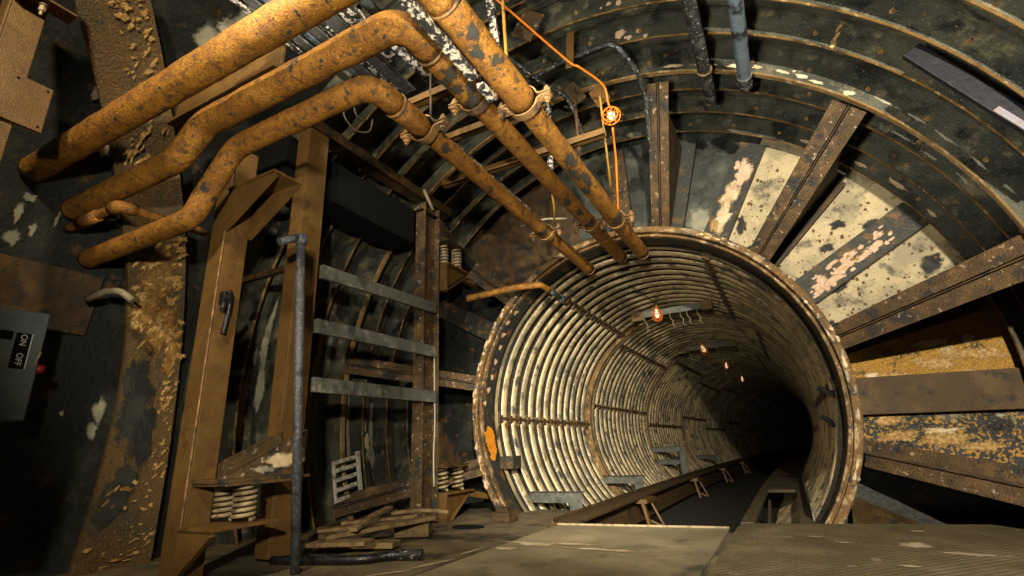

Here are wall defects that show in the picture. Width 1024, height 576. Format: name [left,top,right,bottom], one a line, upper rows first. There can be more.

peeling [700,158,793,285]
peeling [801,225,895,393]
peeling [911,338,948,349]
water stain [92,352,157,529]
peeling [851,459,860,492]